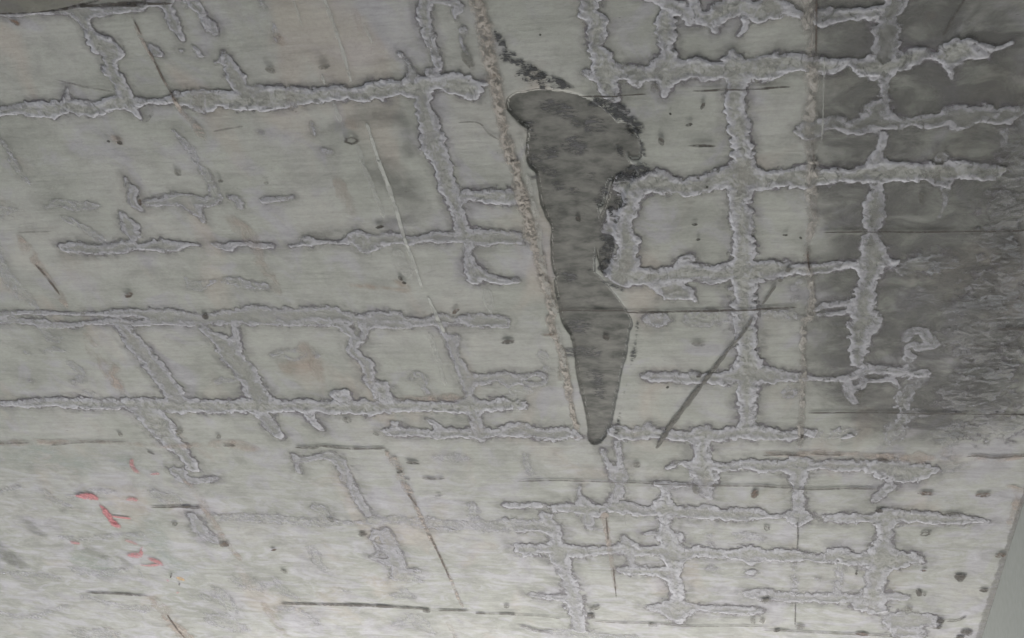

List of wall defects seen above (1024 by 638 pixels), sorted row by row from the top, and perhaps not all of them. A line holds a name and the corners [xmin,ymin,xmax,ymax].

crack [0,1,172,14]
crack [697,85,789,93]
crack [582,92,645,100]
crack [558,306,796,314]
leakage [221,0,1024,638]
crack [811,410,1024,418]
crack [296,443,385,451]
crack [968,453,1024,461]
crack [528,480,873,490]
crack [153,503,200,511]
crack [87,590,143,598]
crack [282,603,559,619]